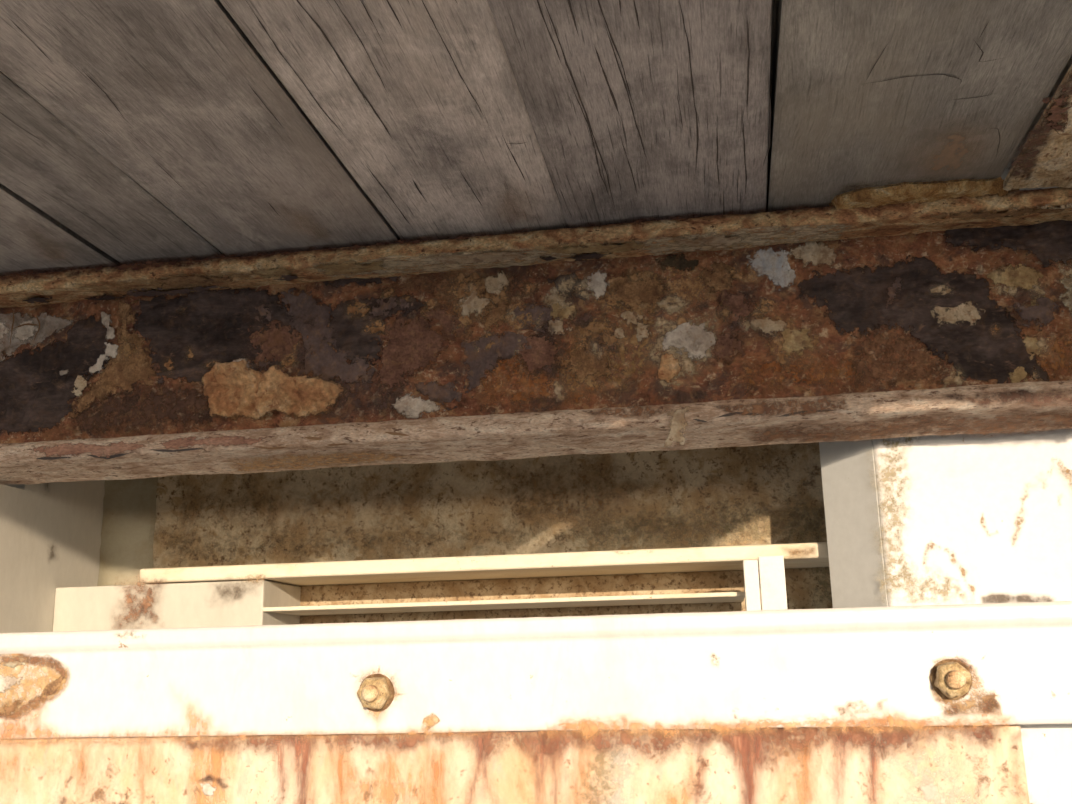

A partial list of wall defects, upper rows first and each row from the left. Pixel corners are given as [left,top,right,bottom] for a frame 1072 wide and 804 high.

rust [776,75,1072,213]
spalling [0,312,119,435]
rust [0,250,294,281]
rust [33,297,401,458]
spalling [82,264,436,384]
peeling [391,392,445,419]
peeling [531,381,564,412]
spalling [313,203,1072,401]
rust [716,389,1072,444]
leakage [880,437,964,596]
rust [165,712,311,804]
rust [325,659,1007,804]